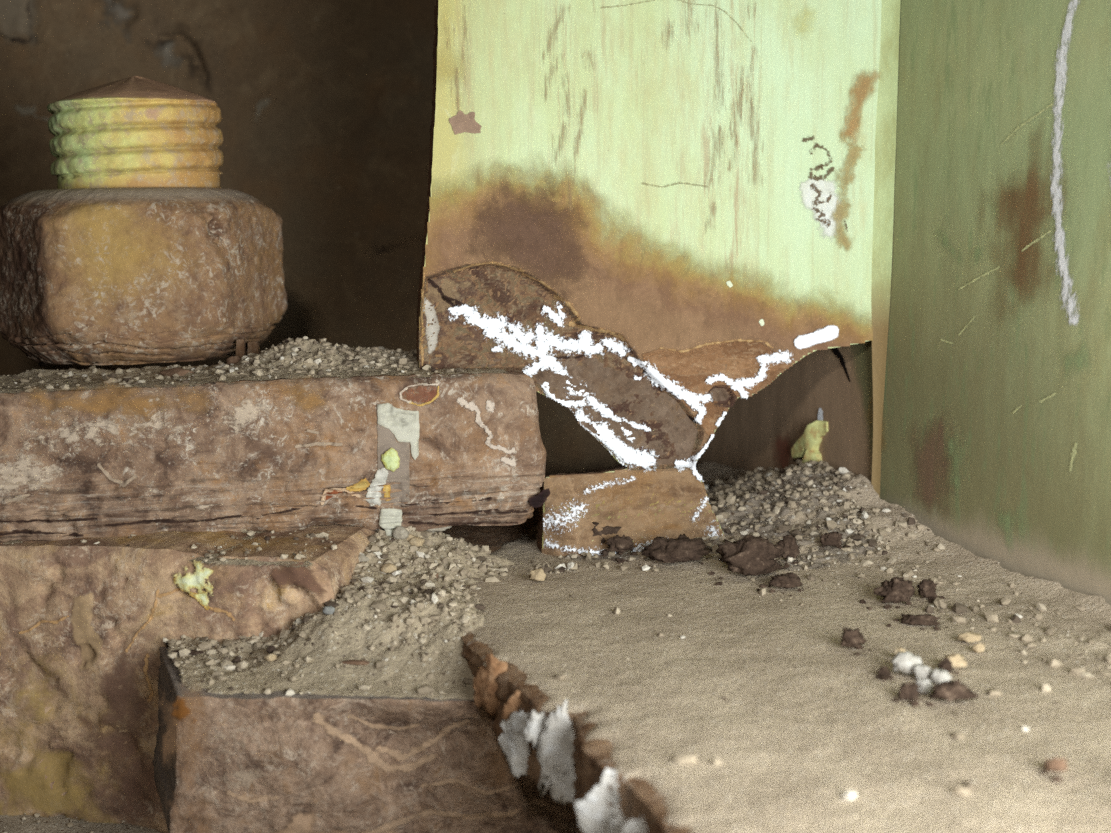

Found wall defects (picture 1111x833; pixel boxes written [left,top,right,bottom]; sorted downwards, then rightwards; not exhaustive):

rust [833,75,876,250]
rust [1001,170,1044,293]
rust [400,383,439,406]
spalling [419,262,704,470]
rust [419,167,884,518]
hole [708,385,737,407]
peeling [791,420,828,467]